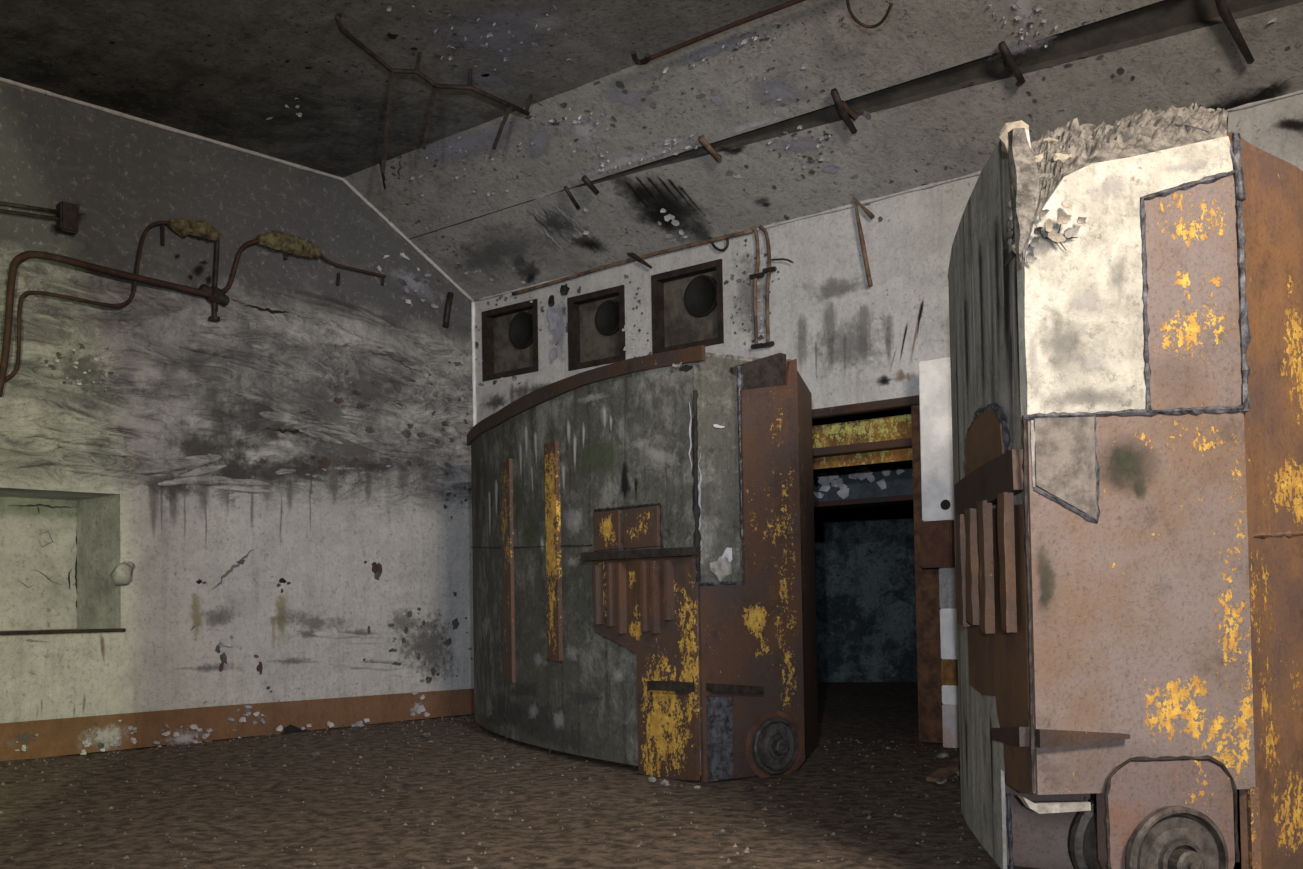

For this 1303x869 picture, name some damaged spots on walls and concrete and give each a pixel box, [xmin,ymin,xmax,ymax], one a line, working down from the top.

leakage [626,177,699,209]
spalling [999,102,1229,272]
leakage [152,473,188,496]
leakage [220,458,388,480]